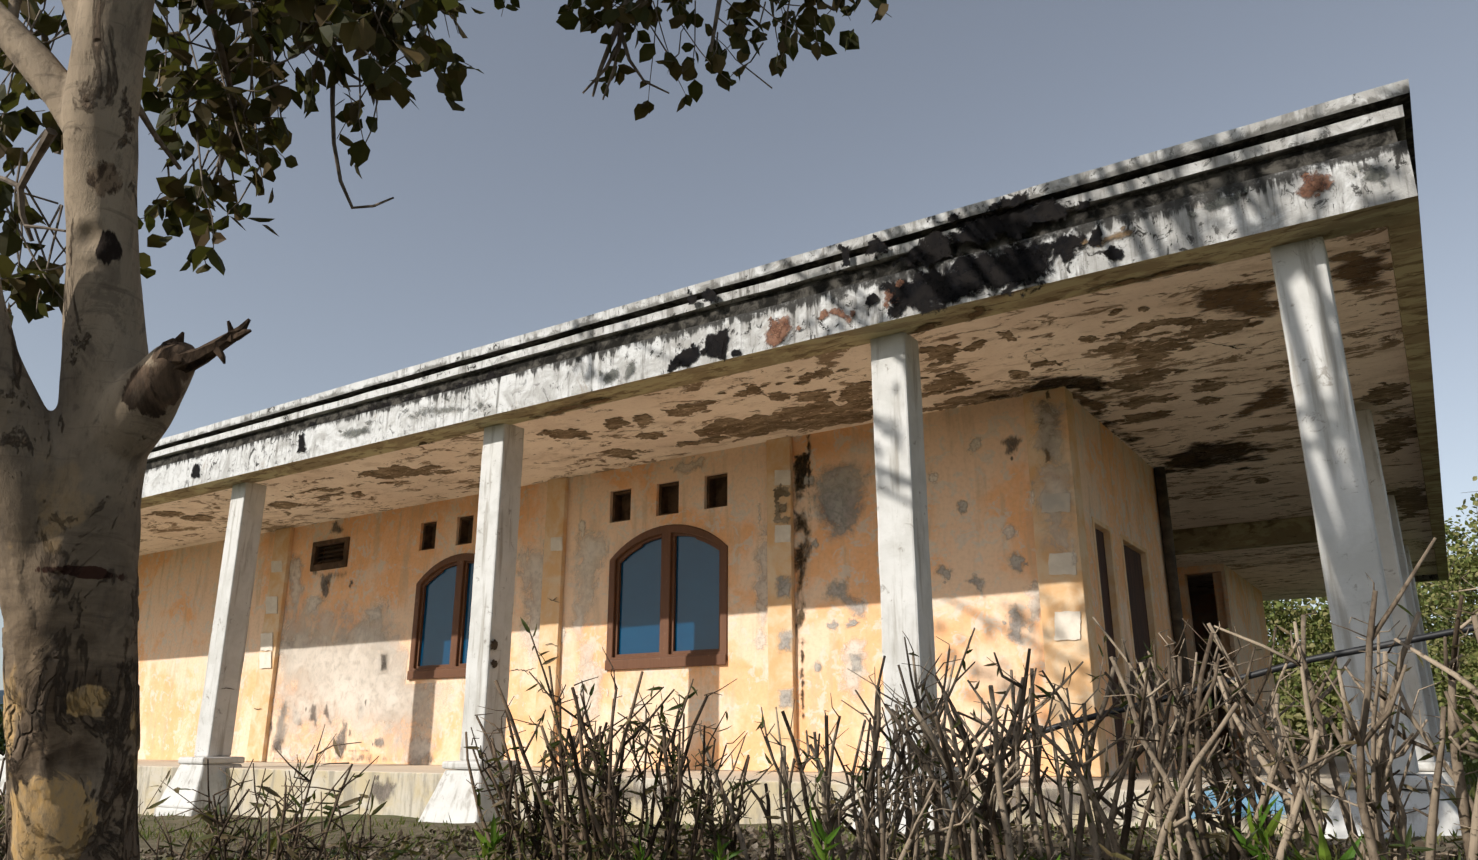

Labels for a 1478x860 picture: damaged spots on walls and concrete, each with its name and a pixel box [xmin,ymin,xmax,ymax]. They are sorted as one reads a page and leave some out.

damp [837,190,1124,334]
damp [1087,263,1217,293]
damp [1193,281,1280,327]
peeling [536,367,873,473]
peeling [919,330,1063,412]
peeling [1078,307,1257,425]
peeling [1360,382,1418,454]
peeling [754,465,865,649]
peeling [1003,525,1040,643]